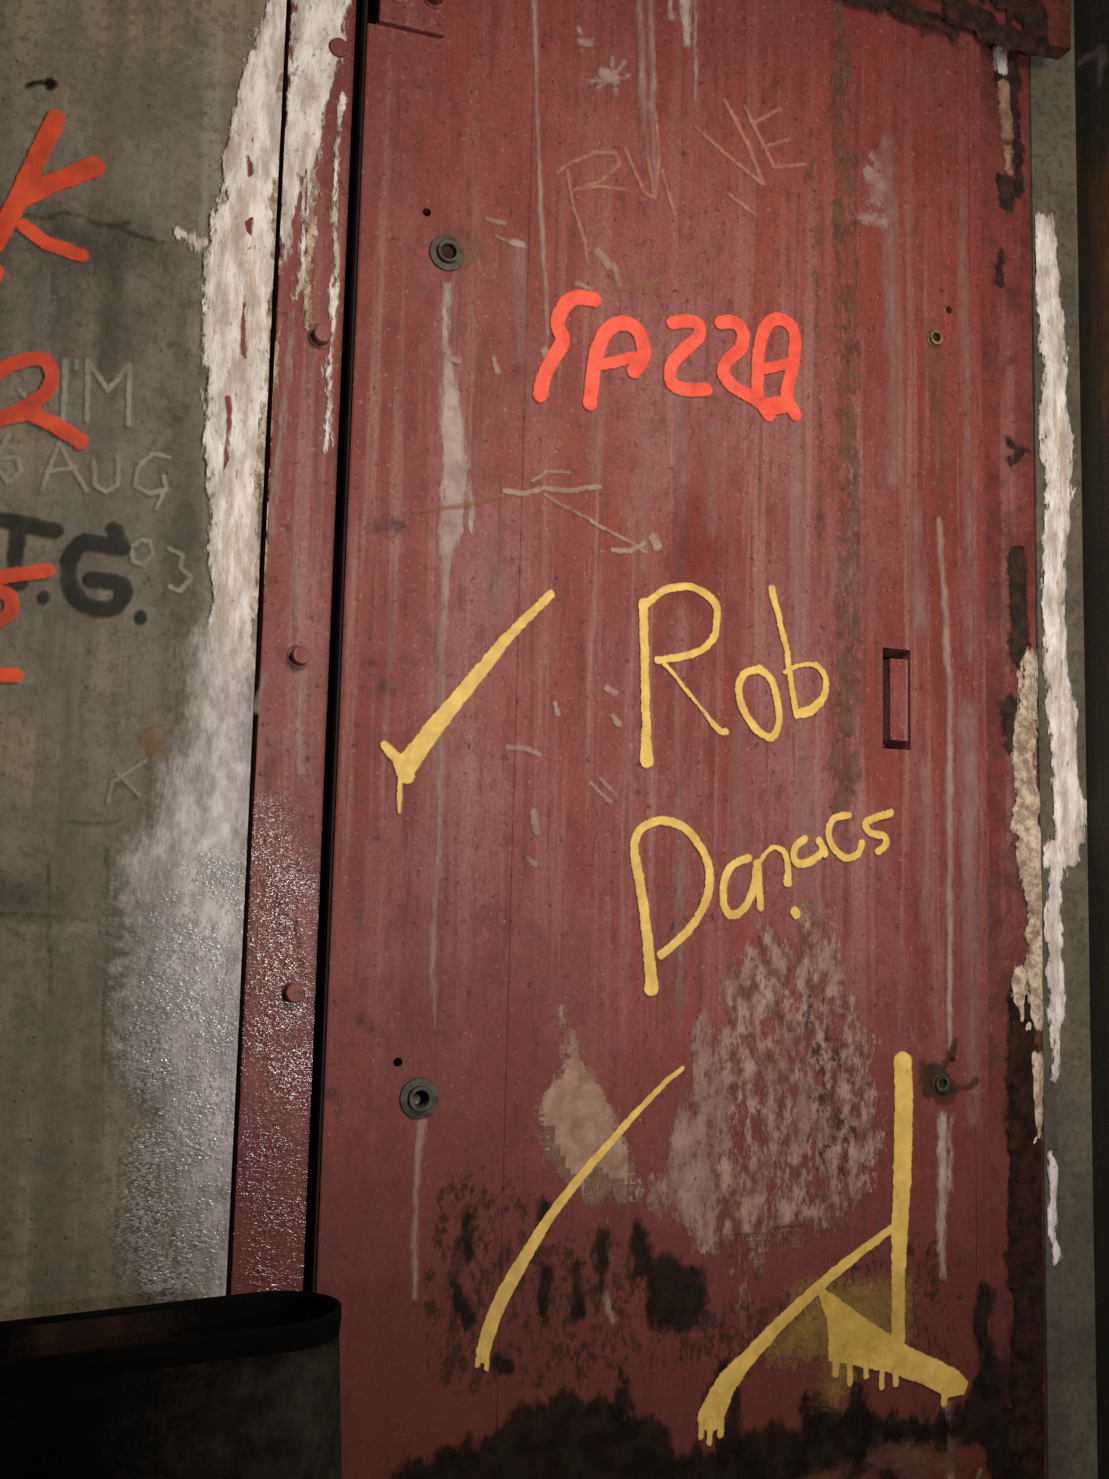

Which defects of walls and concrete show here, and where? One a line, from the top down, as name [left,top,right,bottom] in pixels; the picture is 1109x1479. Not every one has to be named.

rust [813,0,1056,847]
leakage [118,0,313,1303]
spalling [425,1168,963,1392]
peeling [535,897,887,1278]
rust [867,1441,962,1479]
rust [920,1040,978,1104]
rust [1004,984,1045,1479]